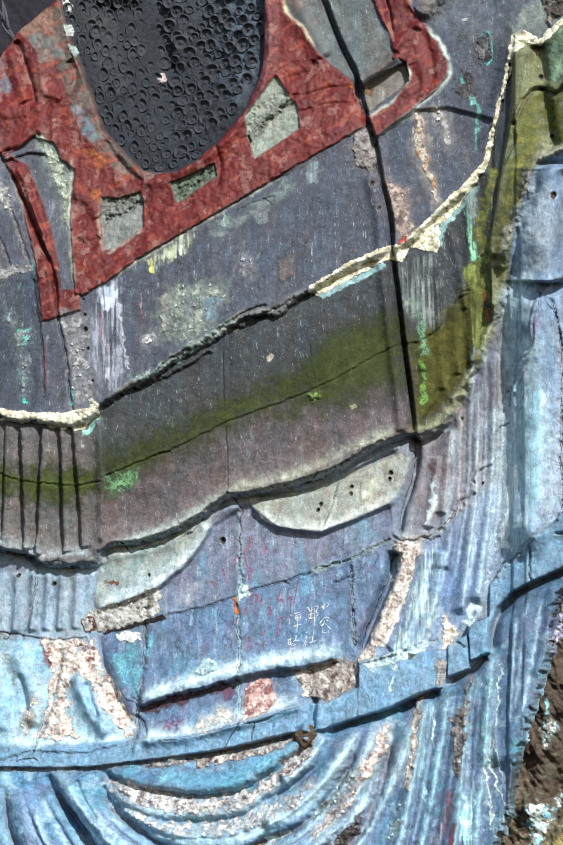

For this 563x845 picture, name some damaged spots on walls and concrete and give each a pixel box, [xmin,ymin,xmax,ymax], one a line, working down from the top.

spalling [542,0,563,26]
spalling [350,125,379,171]
crack [493,277,563,580]
spalling [21,587,166,741]
spalling [189,678,277,733]
spalling [293,540,421,702]
spalling [450,676,473,777]
spalling [108,737,315,845]
spalling [328,813,363,845]
spalling [312,725,391,837]